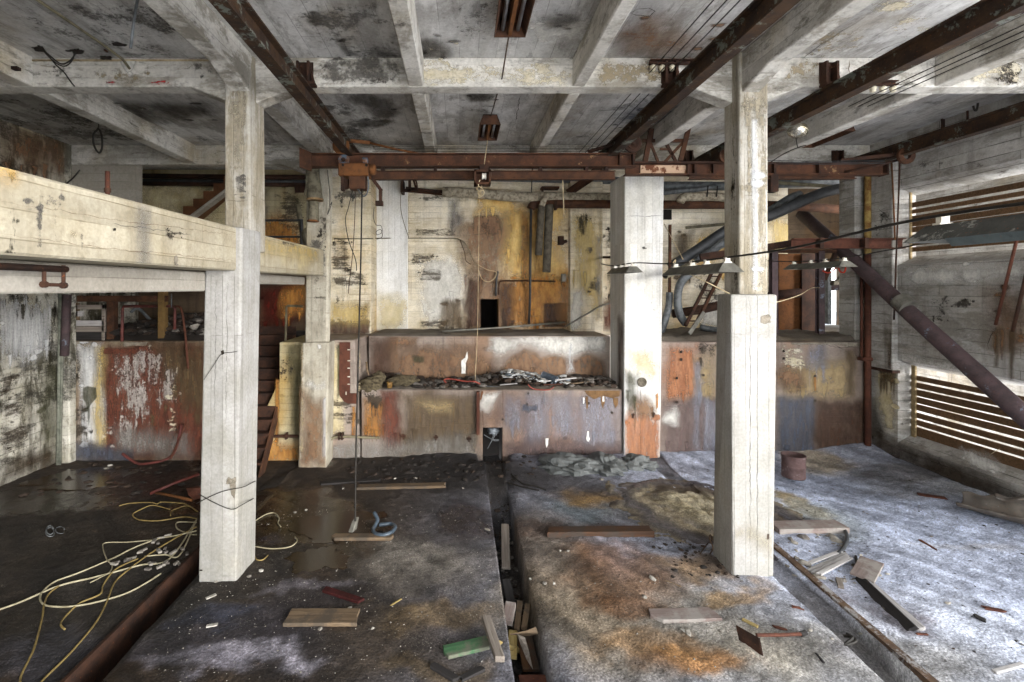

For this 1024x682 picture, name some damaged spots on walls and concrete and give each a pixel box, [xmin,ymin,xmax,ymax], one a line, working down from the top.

damp [29,2,175,55]
damp [297,0,400,140]
damp [280,188,365,286]
rust [473,199,568,329]
damp [0,295,57,480]
peeling [106,342,181,447]
damp [280,203,620,466]
rust [605,301,623,390]
rust [622,348,714,458]